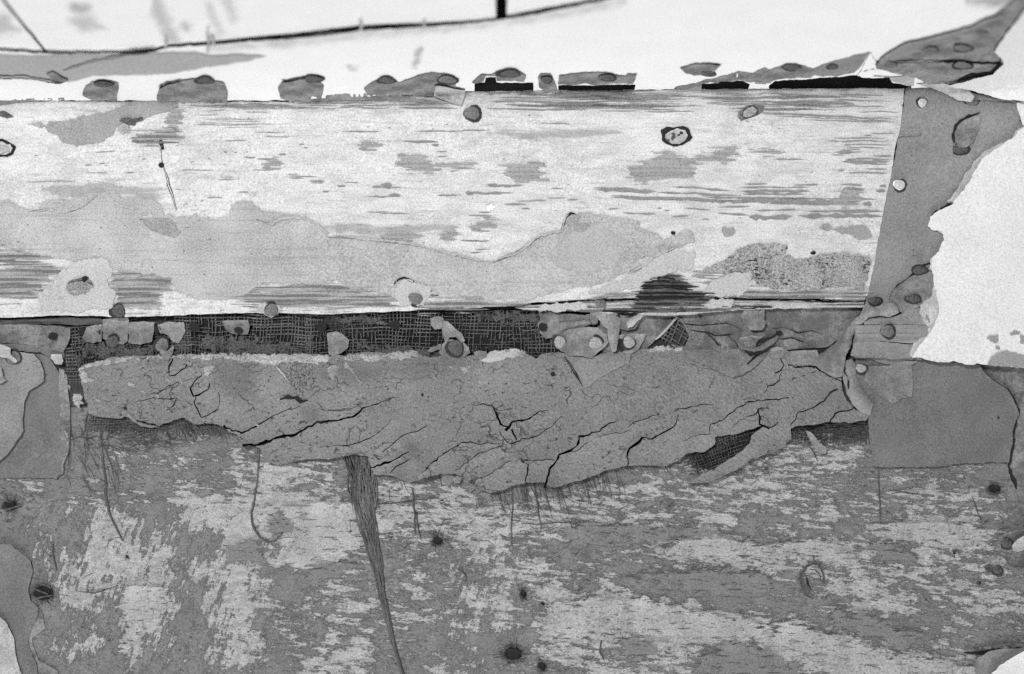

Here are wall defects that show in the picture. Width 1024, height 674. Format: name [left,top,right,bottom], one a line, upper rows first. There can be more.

peeling [0,52,264,82]
peeling [28,100,186,147]
peeling [394,154,478,174]
peeling [497,161,550,184]
peeling [625,146,786,185]
peeling [0,187,874,319]
flaking render [649,345,683,353]
crack [79,297,868,493]
flaking render [806,431,827,454]
peeling [220,502,404,573]
peeling [115,582,171,654]
peeling [542,515,990,674]